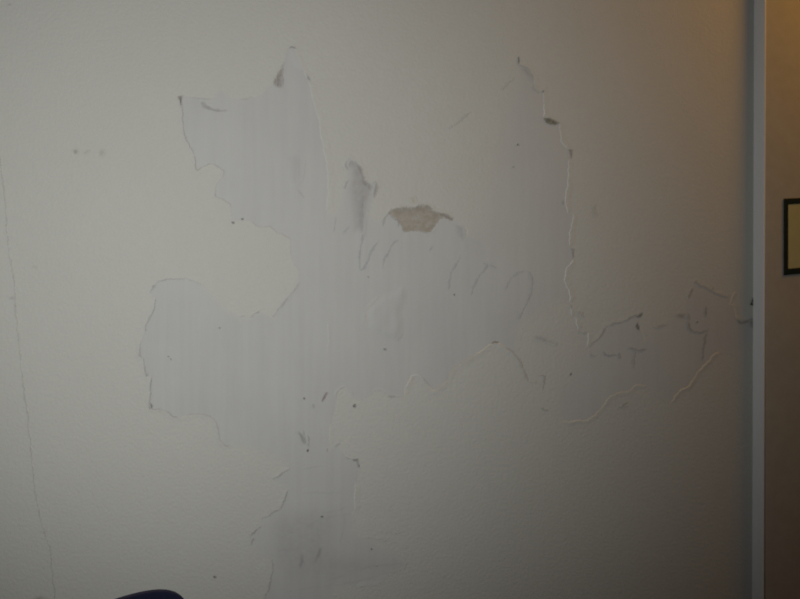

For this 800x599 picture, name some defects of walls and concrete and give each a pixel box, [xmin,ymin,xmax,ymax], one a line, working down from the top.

peeling [134,45,335,466]
spalling [382,201,454,237]